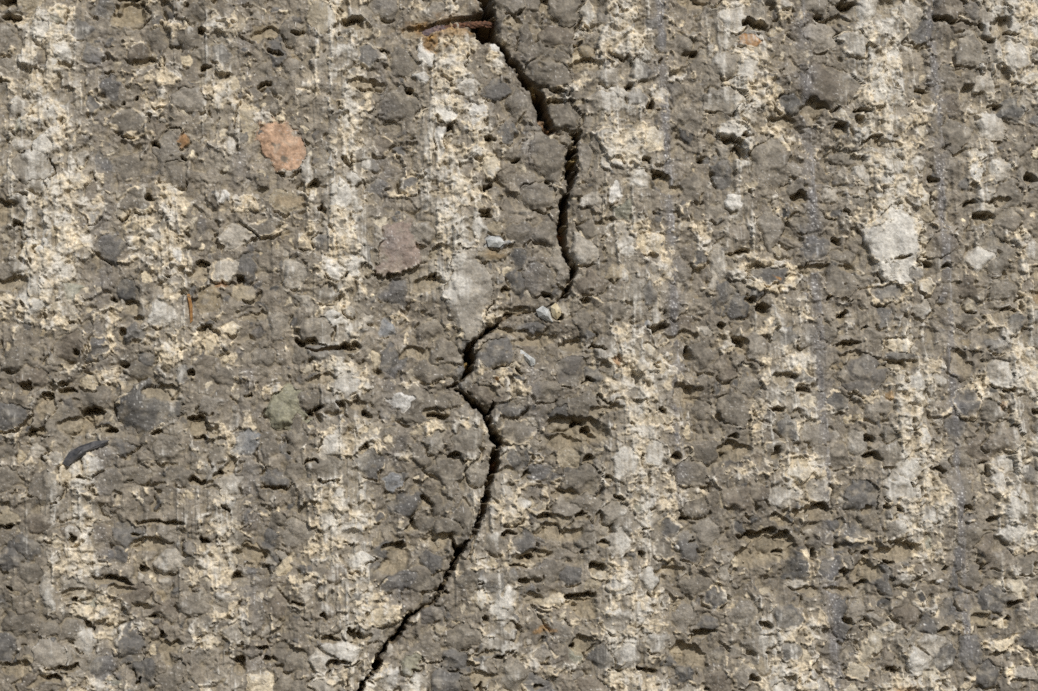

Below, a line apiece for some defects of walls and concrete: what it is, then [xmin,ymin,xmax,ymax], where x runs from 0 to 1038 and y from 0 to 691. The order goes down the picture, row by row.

crack [306,345,357,353]
crack [357,0,583,691]